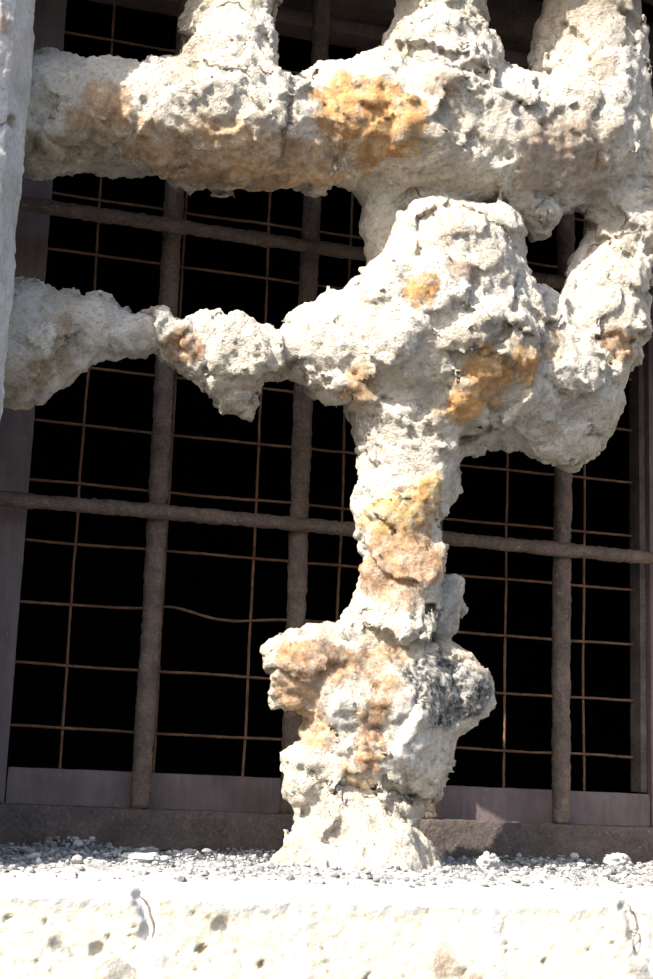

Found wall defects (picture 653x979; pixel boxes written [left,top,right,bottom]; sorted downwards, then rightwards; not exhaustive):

rust [67,78,133,148]
rust [309,69,459,177]
rust [400,272,440,309]
rust [335,358,380,407]
rust [443,332,562,425]
rust [595,327,634,362]
rust [356,470,442,546]
rust [272,637,408,789]
crack [627,904,652,979]